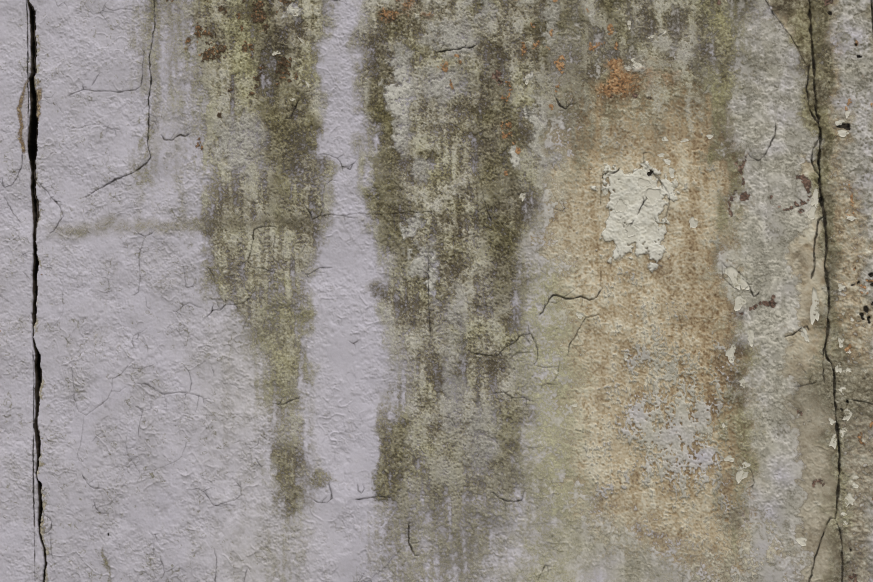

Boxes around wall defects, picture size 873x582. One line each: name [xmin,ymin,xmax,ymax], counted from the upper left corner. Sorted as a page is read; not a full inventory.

crack [97,3,189,190]
corrosion [184,23,229,62]
corrosion [218,0,298,98]
peeling [379,48,457,150]
corrosion [589,24,653,107]
crack [10,0,57,582]
damp [124,0,336,514]
peeling [400,212,439,303]
crack [540,290,601,314]
damp [348,0,873,582]
peeling [523,0,873,582]
crack [786,0,873,582]